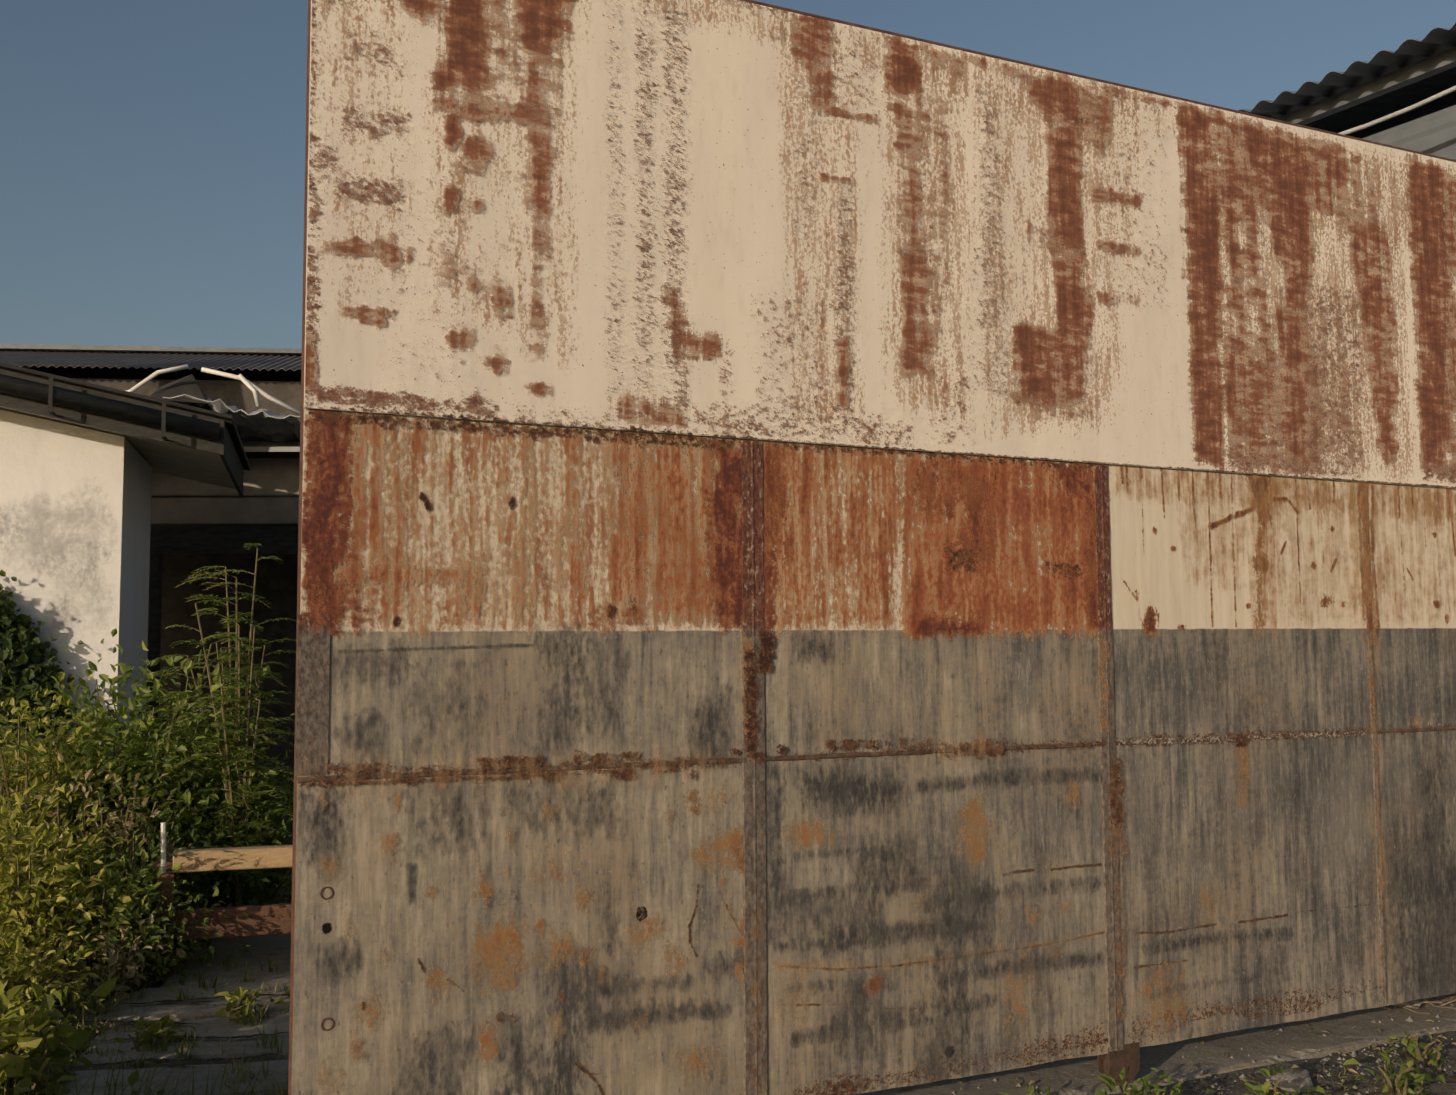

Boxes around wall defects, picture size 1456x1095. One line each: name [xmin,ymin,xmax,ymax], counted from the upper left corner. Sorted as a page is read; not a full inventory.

rust [299,0,1456,860]
rust [470,866,605,994]
rust [691,826,762,1095]
rust [793,885,1382,1095]